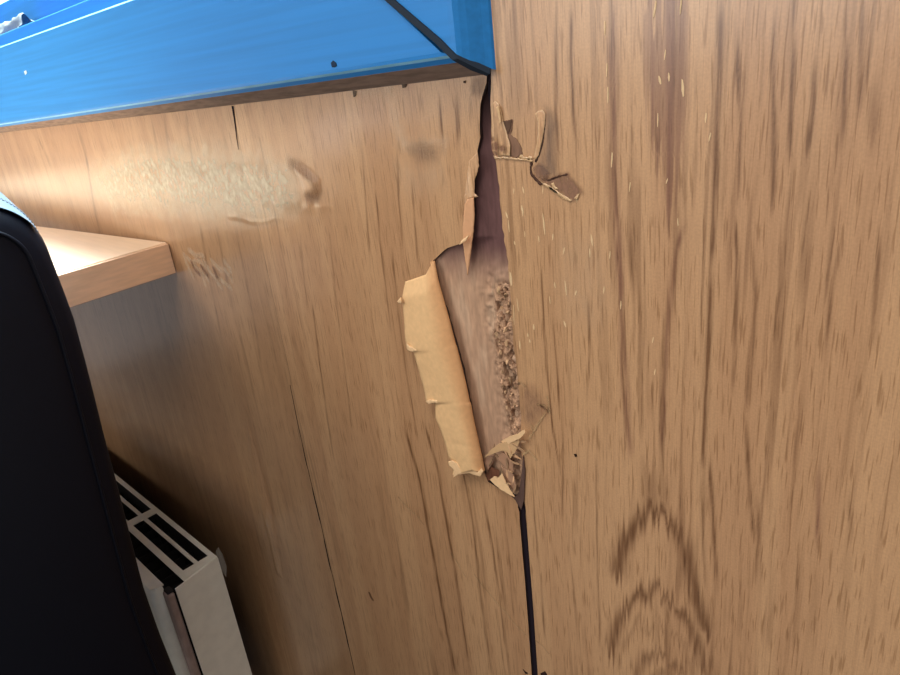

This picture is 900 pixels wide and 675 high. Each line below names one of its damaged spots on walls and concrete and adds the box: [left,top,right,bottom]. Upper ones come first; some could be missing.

crack [485,74,493,110]
peeling [492,101,523,158]
spalling [484,282,526,497]
crack [290,386,355,673]
crack [514,455,547,675]